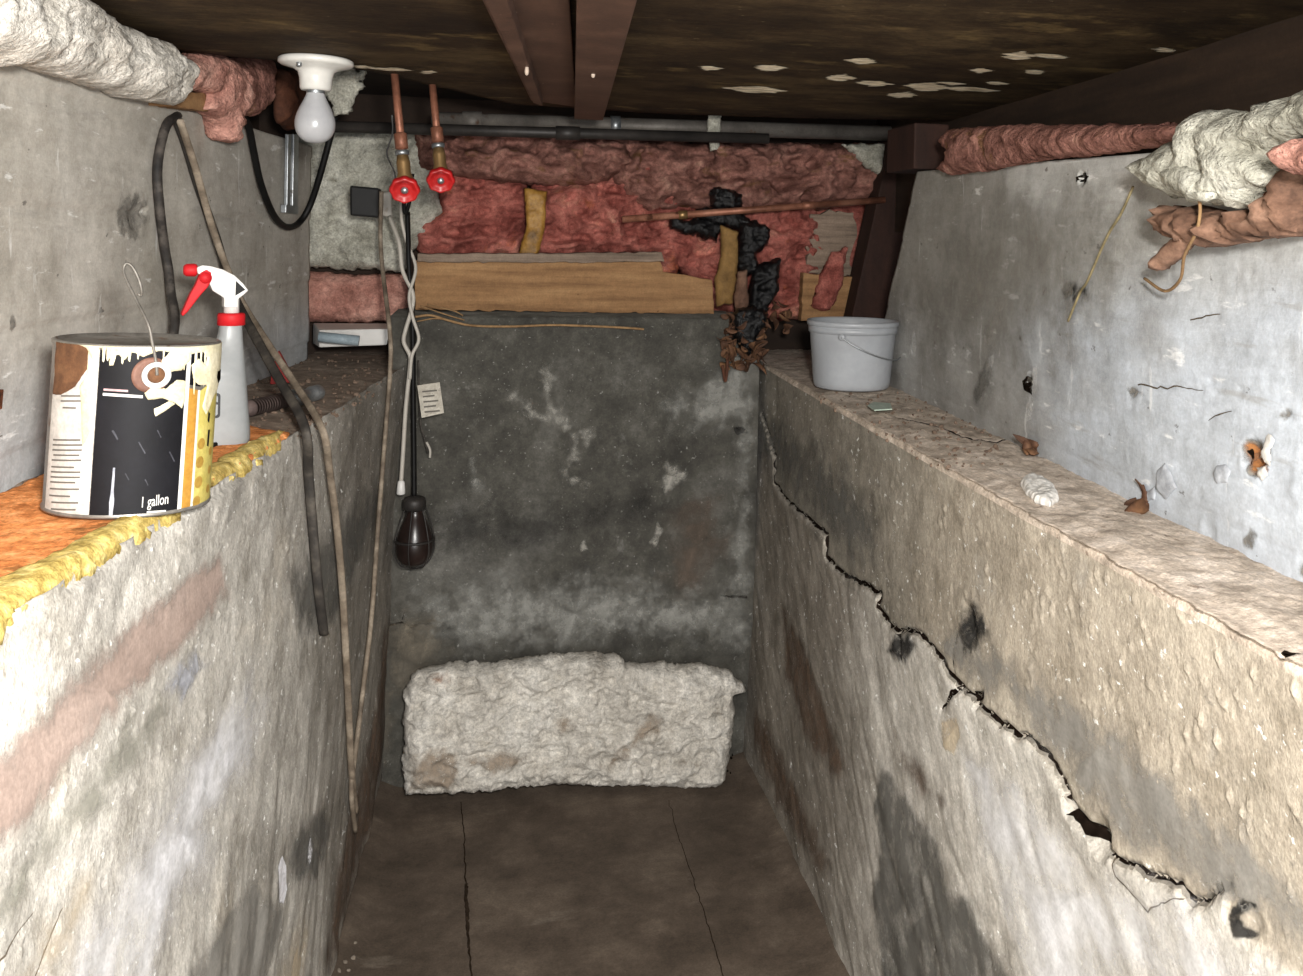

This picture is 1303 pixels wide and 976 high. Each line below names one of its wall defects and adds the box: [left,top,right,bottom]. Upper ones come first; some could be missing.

leakage [664,467,685,492]
spalling [1243,434,1275,481]
crack [762,412,1225,913]
crack [460,802,473,976]
crack [0,908,63,976]